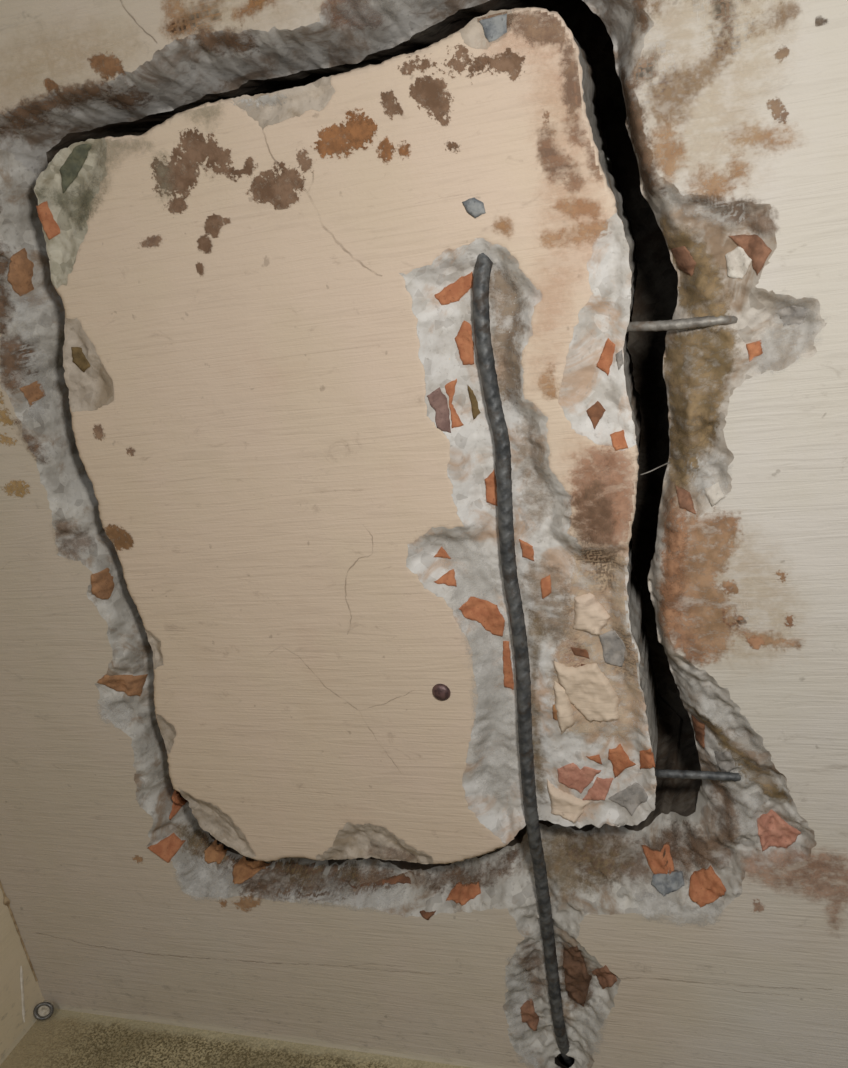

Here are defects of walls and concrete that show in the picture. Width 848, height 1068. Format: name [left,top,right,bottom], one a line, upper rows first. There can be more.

rust [164,0,221,40]
rust [234,0,264,17]
water stain [509,11,602,191]
water stain [633,0,733,121]
water stain [767,99,789,124]
water stain [775,47,789,61]
spalling [0,0,678,777]
spalling [134,163,827,1068]
rust [657,497,801,663]
rust [747,853,848,922]